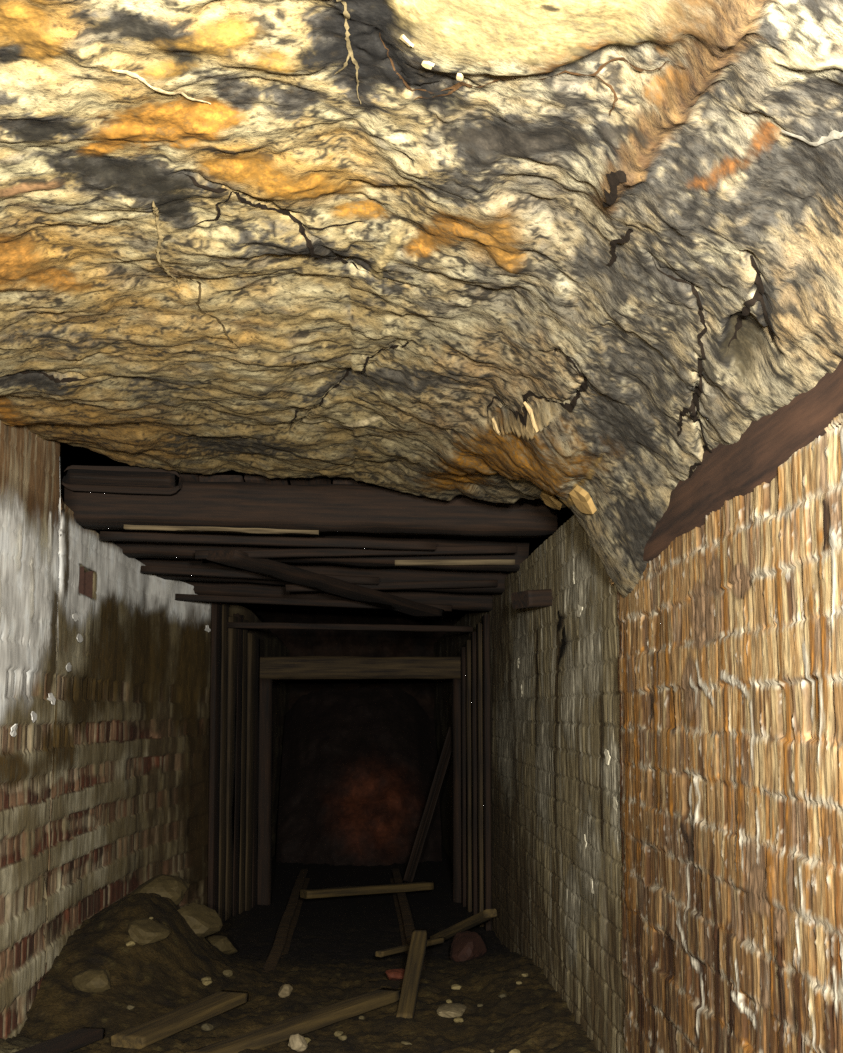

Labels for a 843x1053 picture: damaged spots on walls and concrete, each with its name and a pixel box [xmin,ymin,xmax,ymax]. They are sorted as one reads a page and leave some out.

damp [46,512,69,687]
damp [0,595,210,880]